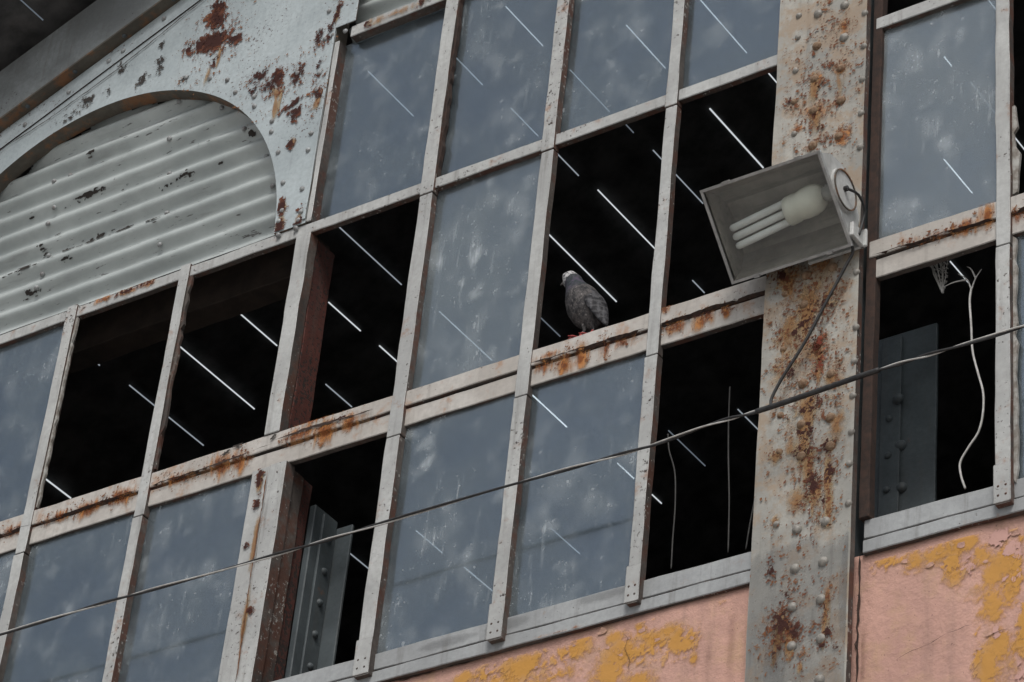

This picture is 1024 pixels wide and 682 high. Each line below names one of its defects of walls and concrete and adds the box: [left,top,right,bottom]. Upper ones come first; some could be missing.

corrosion [175,0,256,95]
corrosion [232,0,344,122]
corrosion [776,0,864,170]
corrosion [274,196,303,232]
corrosion [537,330,638,376]
corrosion [34,480,135,531]
corrosion [149,443,266,568]
corrosion [748,254,857,682]
corrosion [240,595,254,645]
peeling [453,621,700,682]
crack [854,551,863,682]
peeling [869,527,1024,682]